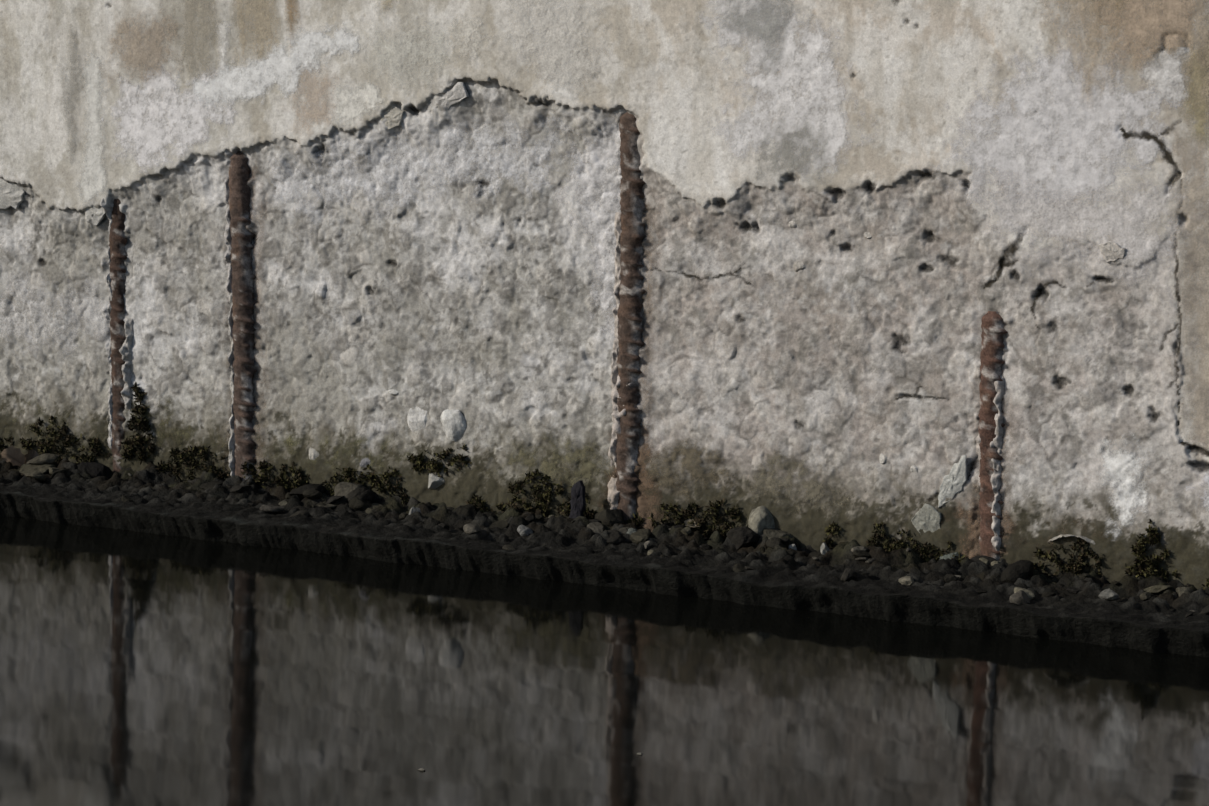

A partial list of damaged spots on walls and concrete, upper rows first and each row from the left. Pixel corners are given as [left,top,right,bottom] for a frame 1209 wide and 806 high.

damp [951,48,1188,284]
spalling [0,78,1209,590]
crack [1120,123,1209,457]
rust [634,426,663,532]
rust [957,498,981,559]
efflorescence [1100,440,1147,536]